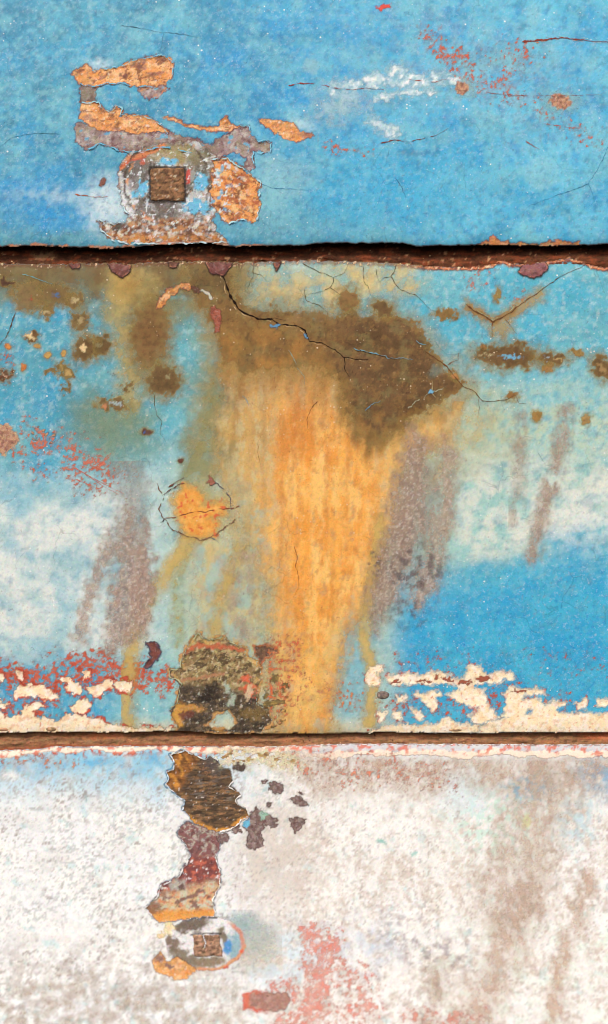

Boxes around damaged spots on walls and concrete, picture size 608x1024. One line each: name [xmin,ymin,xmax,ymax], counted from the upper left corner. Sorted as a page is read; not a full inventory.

peeling [71,54,314,245]
crack [220,263,436,376]
crack [464,266,583,335]
crack [425,351,524,414]
crack [158,475,239,541]
rust [0,261,482,733]
peeling [0,631,608,980]